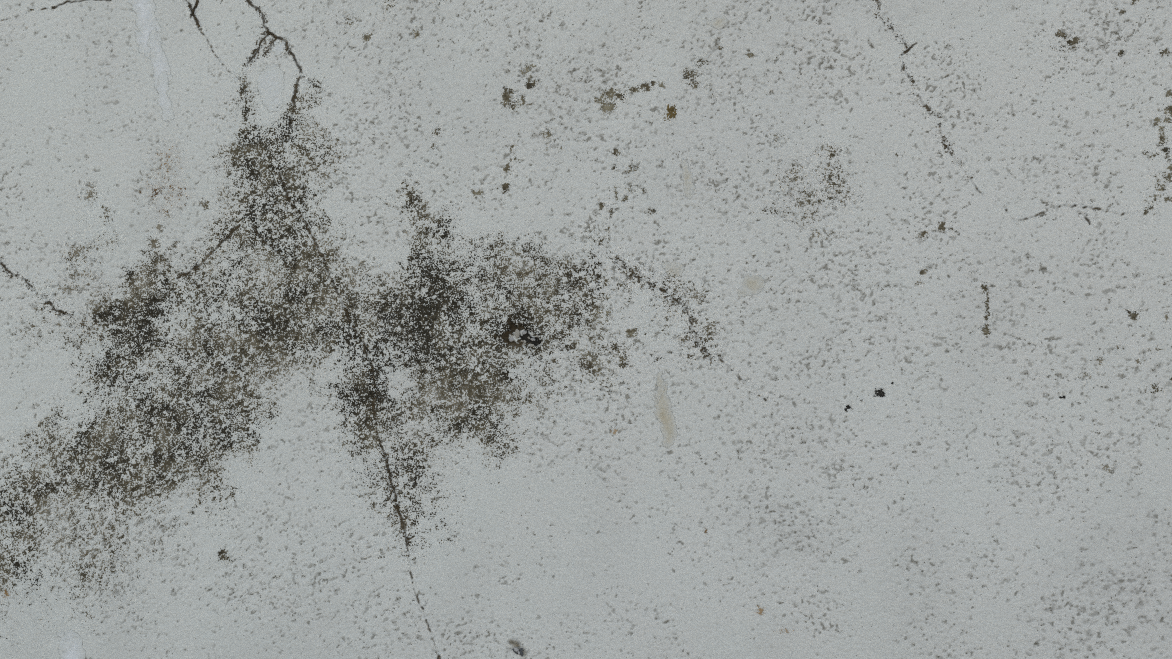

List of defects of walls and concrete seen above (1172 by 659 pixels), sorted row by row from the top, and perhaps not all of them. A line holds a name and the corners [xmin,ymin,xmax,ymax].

crack [188,0,305,125]
crack [872,0,981,193]
crack [0,257,104,341]
crack [177,222,293,279]
water stain [0,42,677,659]
crack [279,172,441,659]